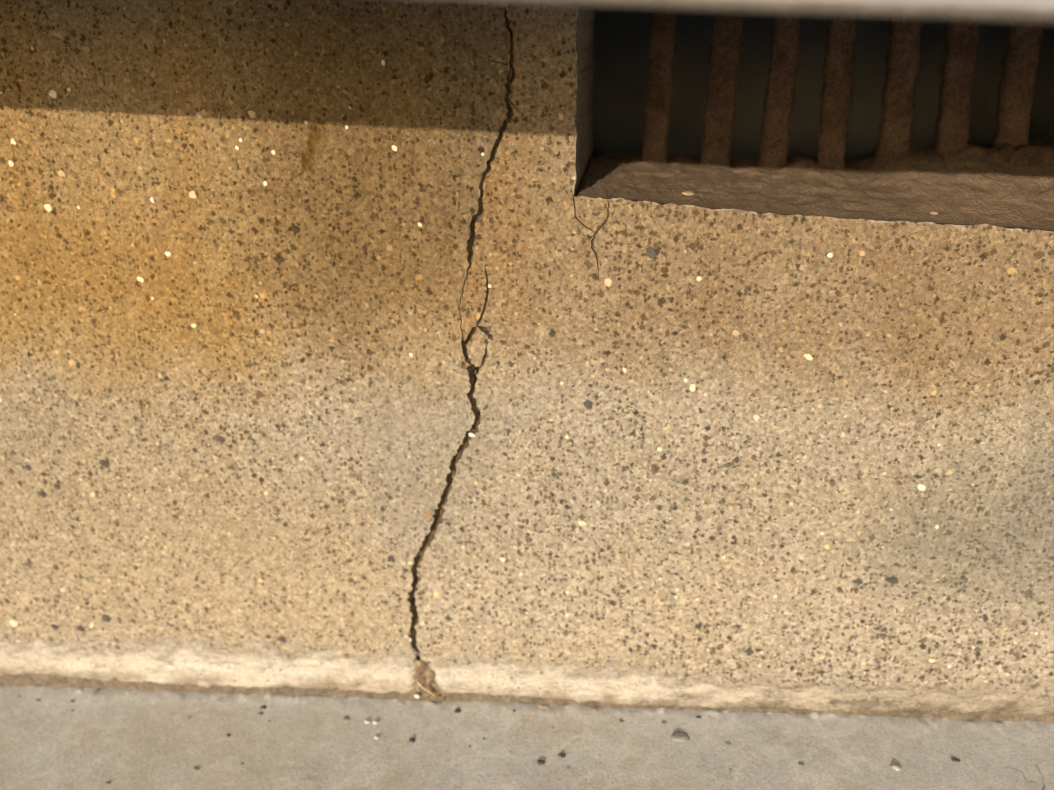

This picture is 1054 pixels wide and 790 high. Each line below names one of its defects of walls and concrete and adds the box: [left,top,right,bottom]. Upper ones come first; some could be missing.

crack [407,8,519,661]
crack [1002,760,1045,790]